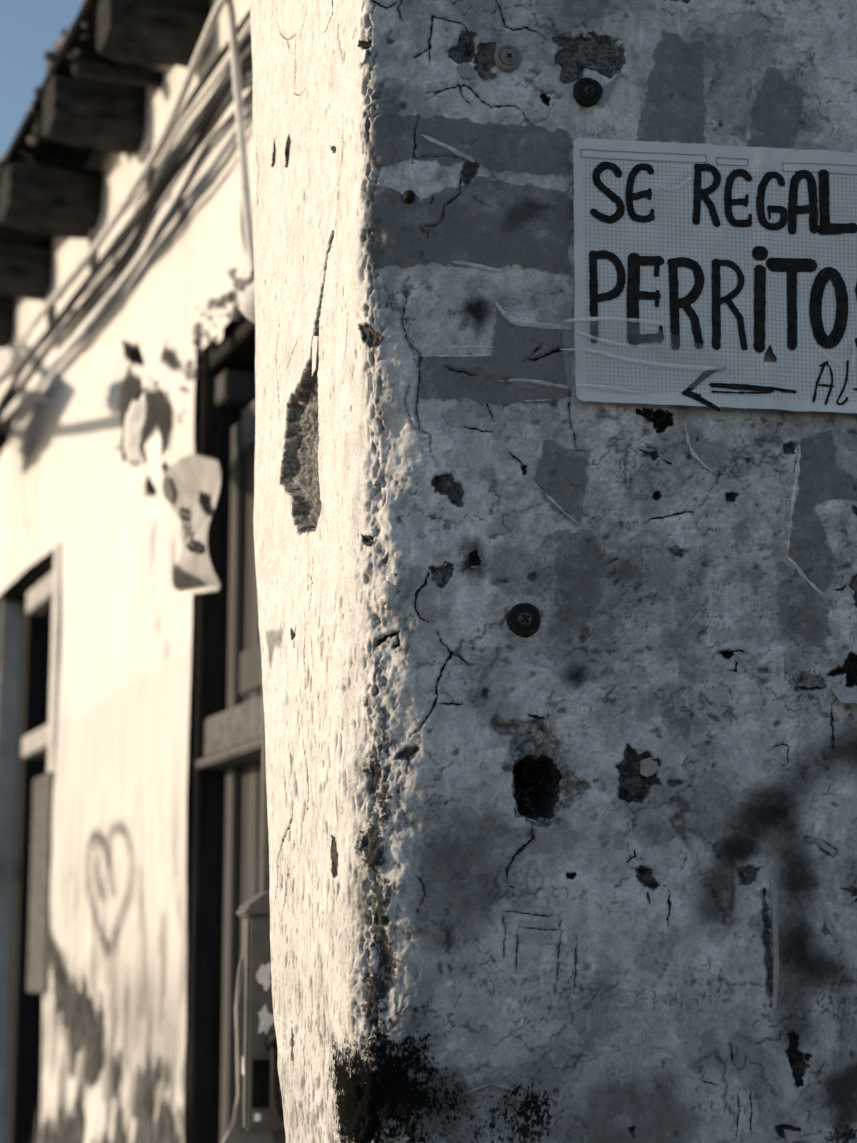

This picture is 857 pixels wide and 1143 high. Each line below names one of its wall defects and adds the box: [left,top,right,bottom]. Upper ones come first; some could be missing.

crack [273,0,343,96]
crack [372,0,403,21]
crack [414,15,469,61]
crack [495,0,545,38]
spalling [553,30,625,105]
crack [412,84,528,238]
spalling [280,230,334,536]
crack [410,632,469,736]
spalling [794,652,857,747]
spalling [491,714,591,888]
spalling [616,743,685,803]
peeling [327,743,569,1143]